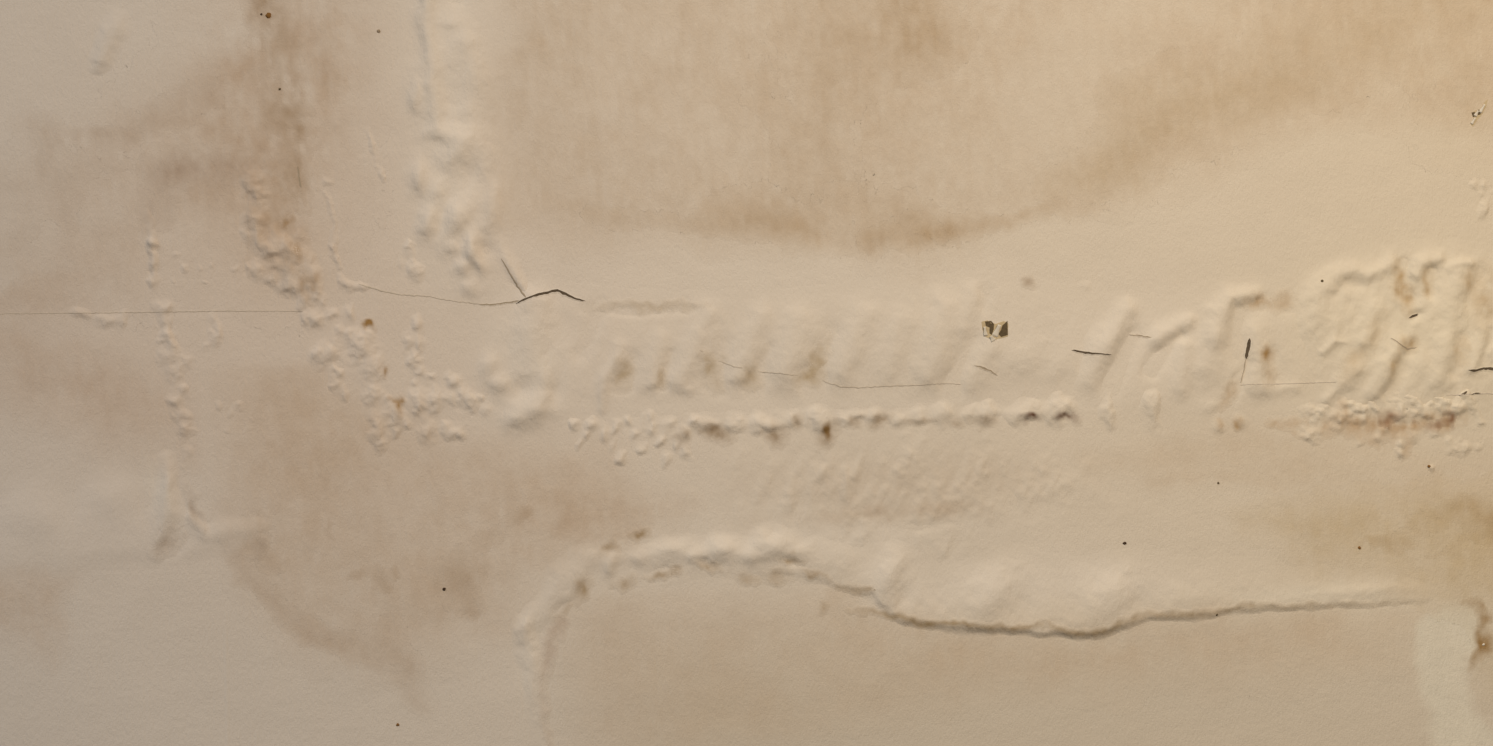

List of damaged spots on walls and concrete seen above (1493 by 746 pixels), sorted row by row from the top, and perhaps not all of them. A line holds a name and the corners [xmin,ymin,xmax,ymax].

leakage [499,0,1493,281]
crack [360,259,585,306]
leakage [1236,286,1299,316]
peeling [982,320,1008,342]
leakage [0,0,712,722]
leakage [695,345,766,398]
leakage [790,328,835,393]
leakage [1254,339,1280,393]
crack [1446,366,1493,396]
leakage [537,373,1493,746]